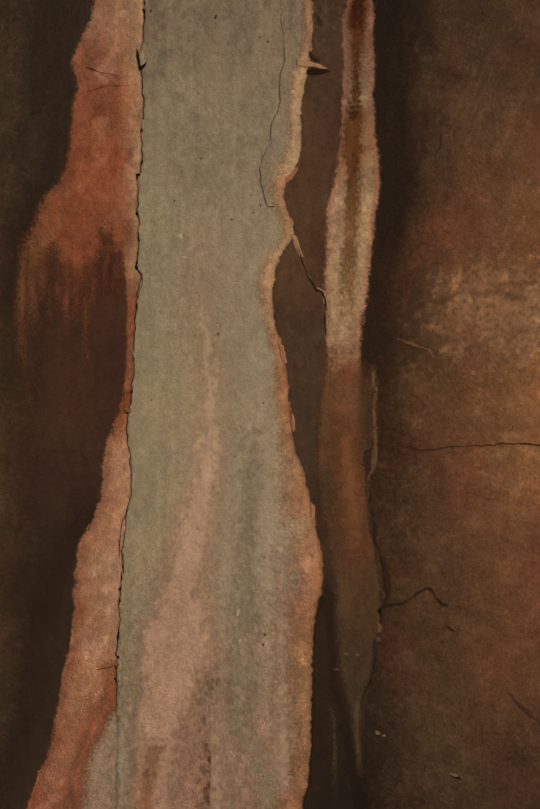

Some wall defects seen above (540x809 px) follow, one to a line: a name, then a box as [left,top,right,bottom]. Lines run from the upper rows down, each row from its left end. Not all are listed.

corrosion [13,0,145,809]
peeling [70,0,331,809]
crack [259,8,285,207]
crack [297,248,331,342]
corrosion [323,0,381,383]
crack [380,442,540,451]
crack [360,480,460,712]